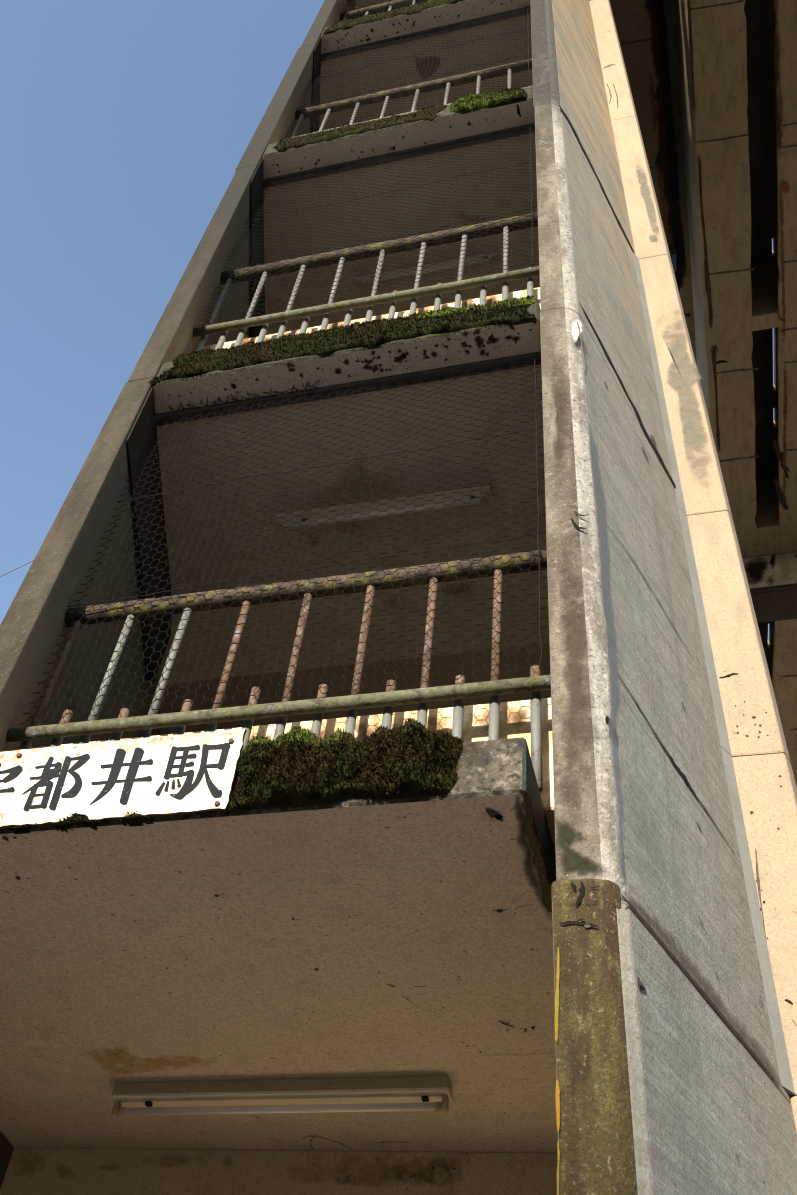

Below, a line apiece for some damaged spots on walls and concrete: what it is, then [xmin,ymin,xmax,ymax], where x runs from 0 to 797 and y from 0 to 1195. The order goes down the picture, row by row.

water stain [688,0,696,111]
water stain [698,158,713,327]
water stain [711,346,720,451]
peeling [486,789,552,914]